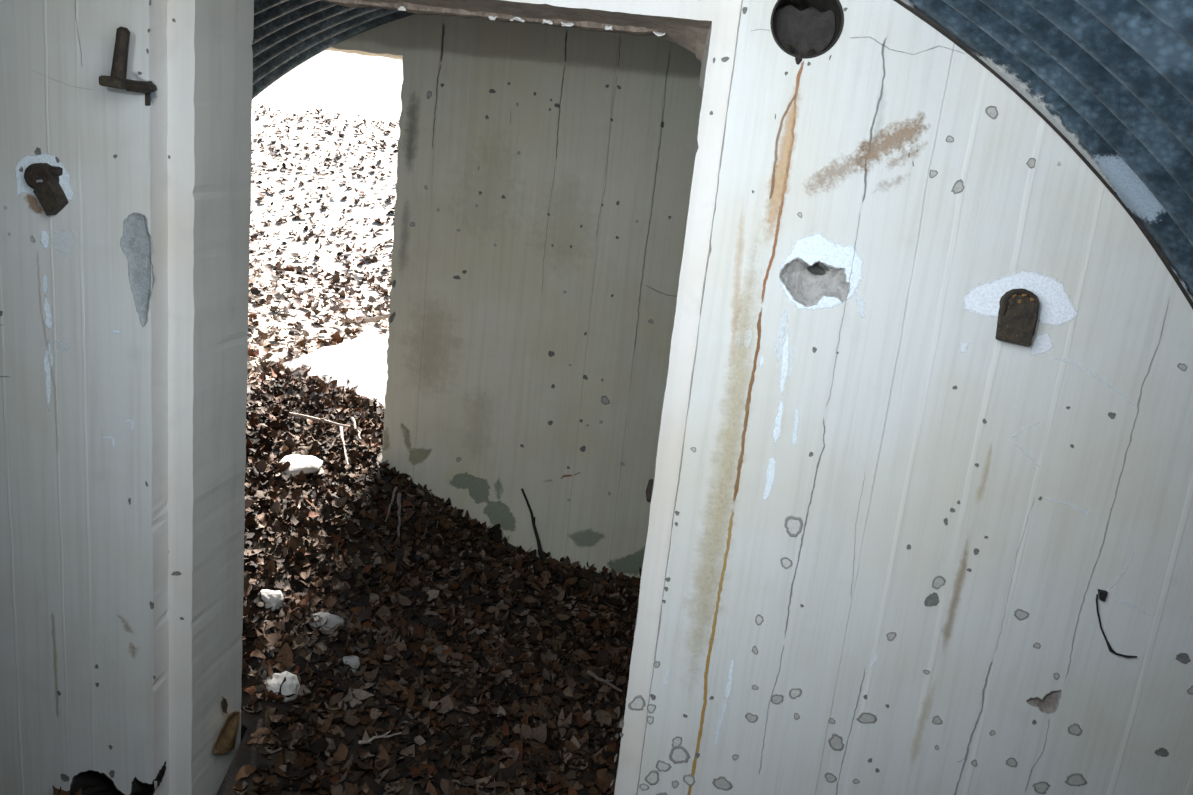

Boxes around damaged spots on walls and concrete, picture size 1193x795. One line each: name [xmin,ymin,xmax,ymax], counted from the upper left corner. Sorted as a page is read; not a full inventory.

crack [863,39,886,200]
rust [860,117,926,164]
peeling [120,212,155,327]
spalling [779,257,850,307]
rust [998,289,1040,336]
rust [688,44,815,795]
crack [785,421,825,633]